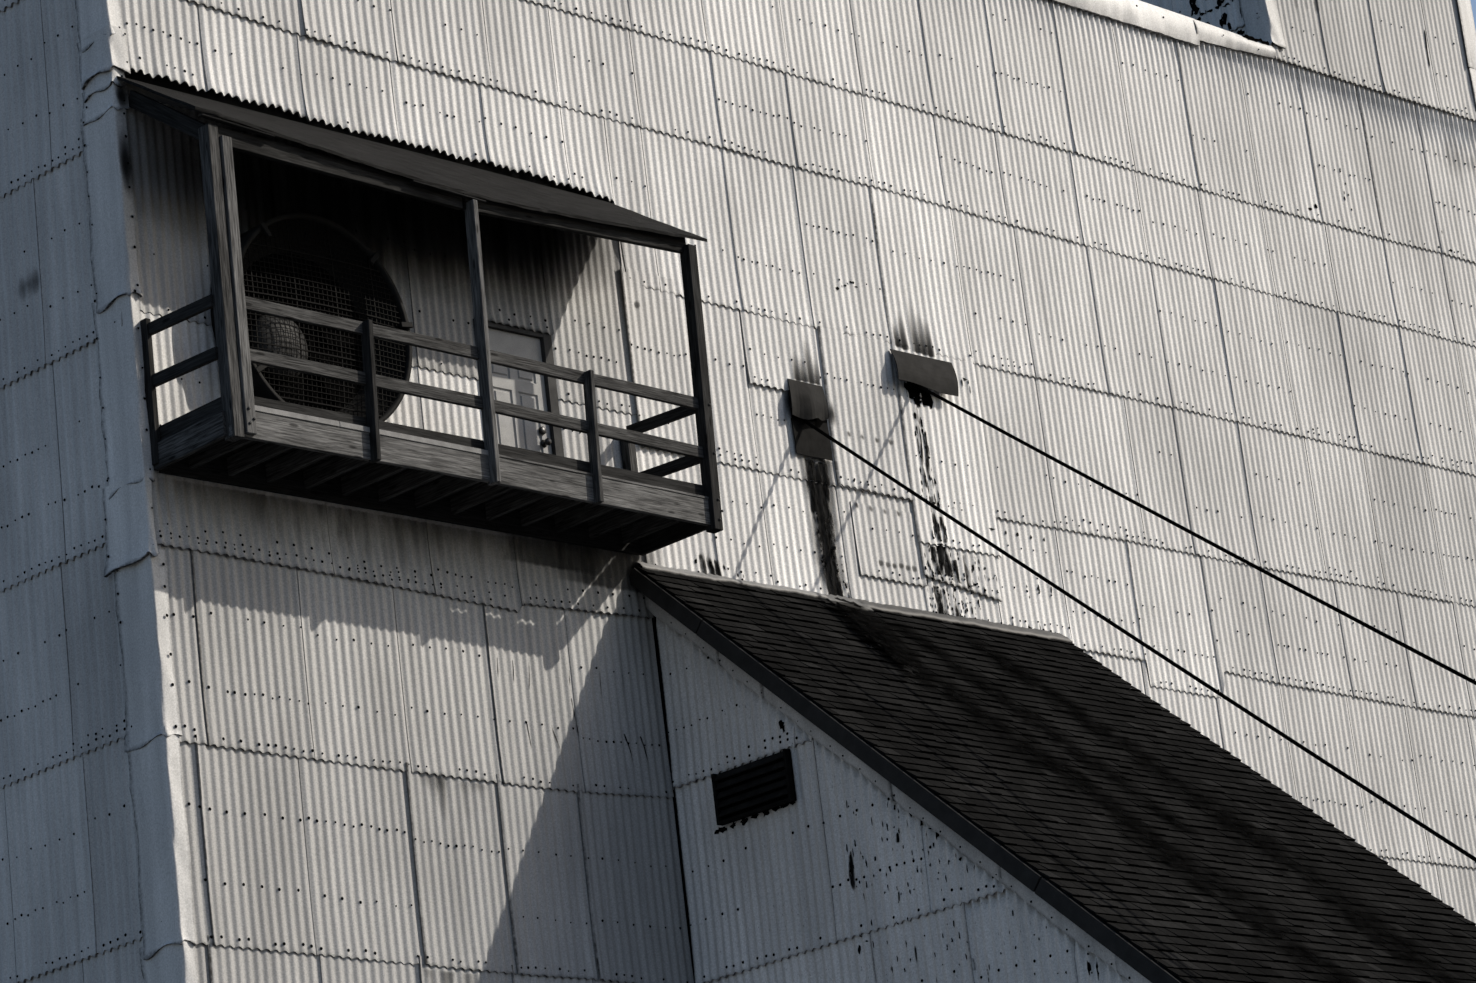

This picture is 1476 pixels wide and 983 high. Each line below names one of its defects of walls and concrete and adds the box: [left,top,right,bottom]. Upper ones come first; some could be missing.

rust [806,460,852,598]
rust [914,412,948,542]
peeling [846,800,975,925]
peeling [858,910,1016,983]